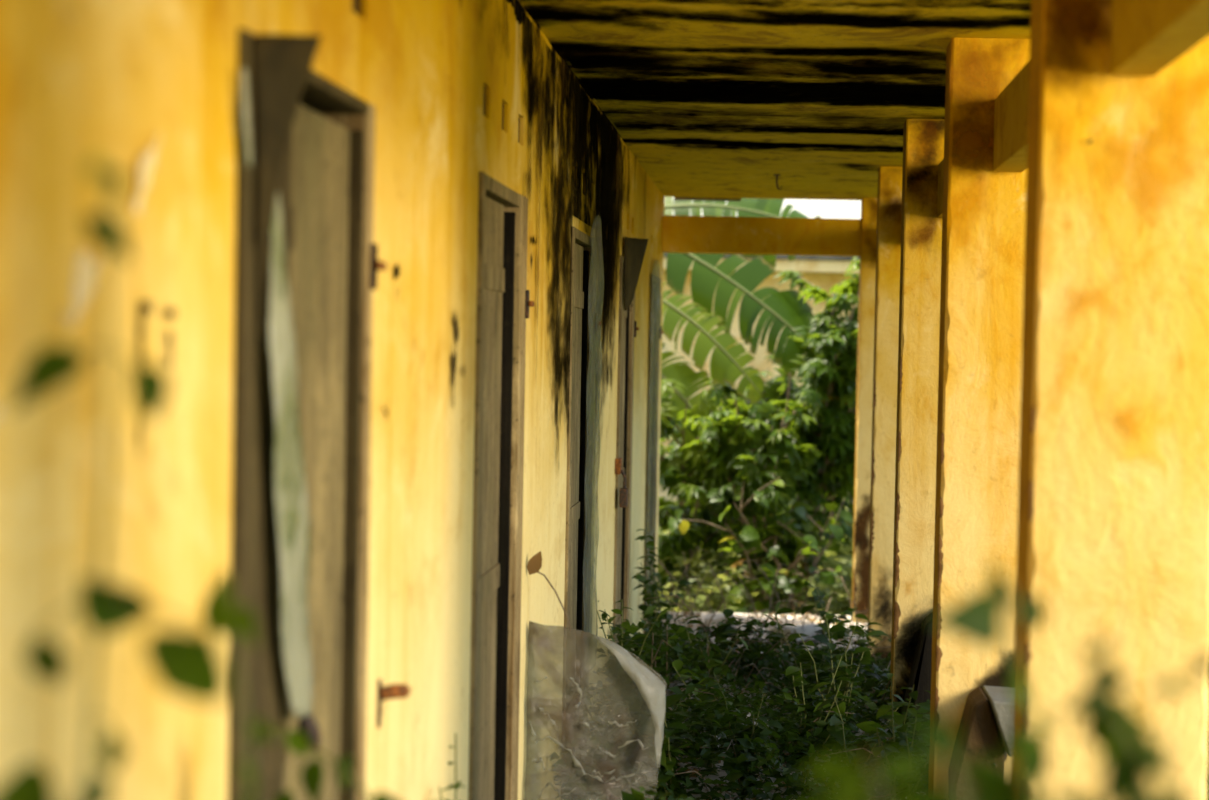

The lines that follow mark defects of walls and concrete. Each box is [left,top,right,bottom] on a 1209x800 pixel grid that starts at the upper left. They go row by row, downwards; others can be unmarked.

damp [506,0,1031,450]
damp [1047,0,1103,66]